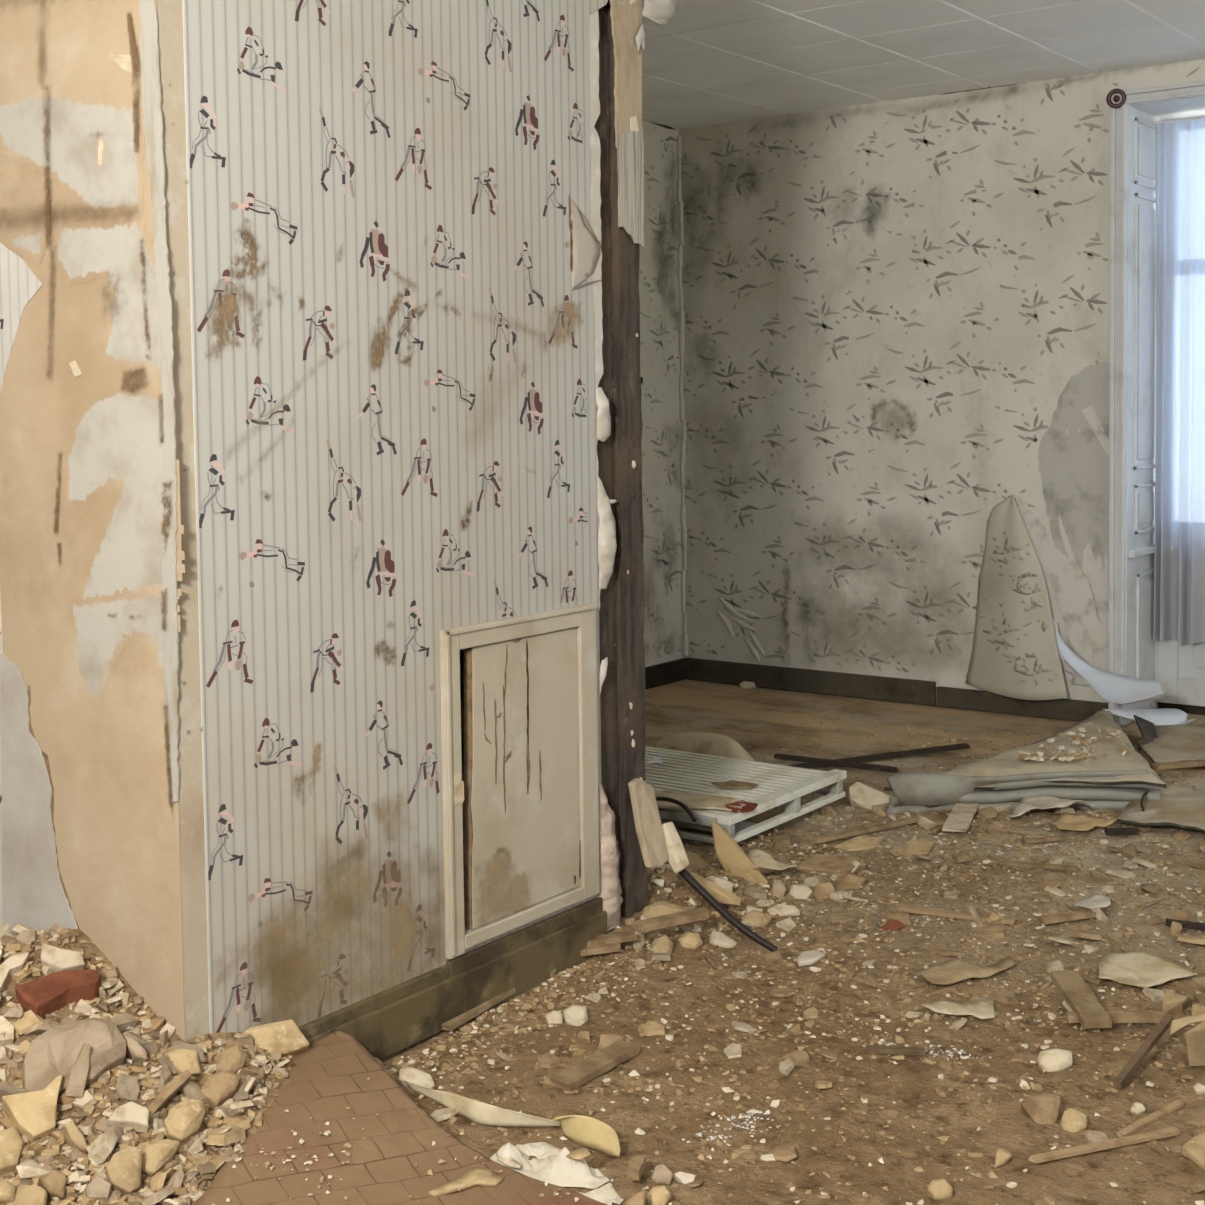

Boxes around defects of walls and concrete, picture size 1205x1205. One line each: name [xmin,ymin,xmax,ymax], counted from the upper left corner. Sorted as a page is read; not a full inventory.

peeling [110,54,132,73]
peeling [630,116,639,132]
flaking render [635,24,645,54]
leakage [216,231,265,355]
peeling [0,84,185,710]
peeling [1016,362,1109,687]
leakage [260,856,418,1020]